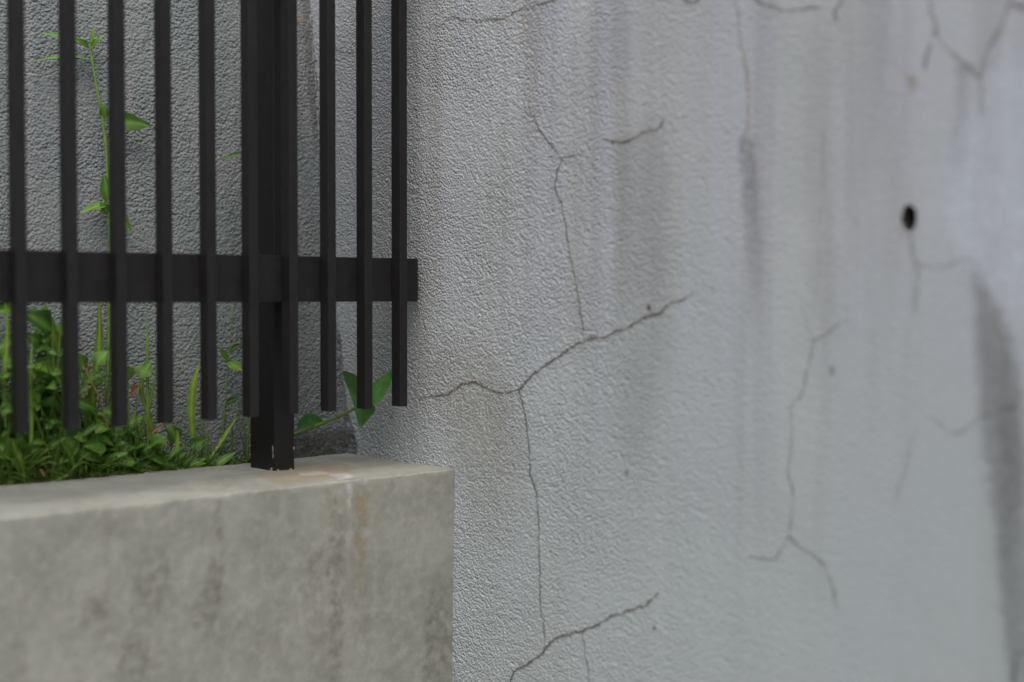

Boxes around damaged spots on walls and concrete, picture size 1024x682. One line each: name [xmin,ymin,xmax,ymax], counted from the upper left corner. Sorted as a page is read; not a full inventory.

crack [419,0,694,681]